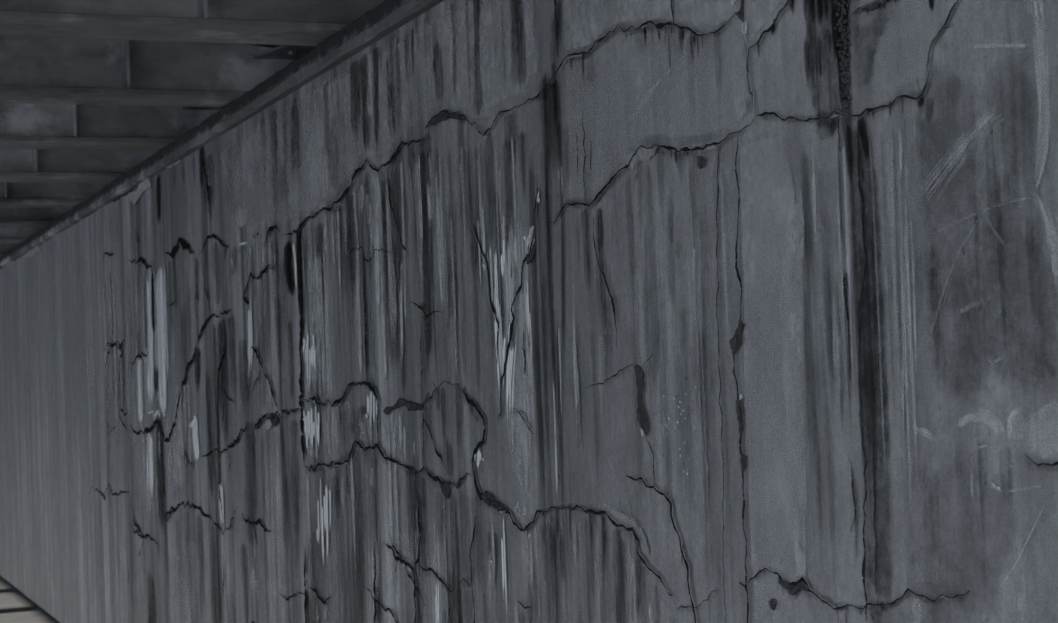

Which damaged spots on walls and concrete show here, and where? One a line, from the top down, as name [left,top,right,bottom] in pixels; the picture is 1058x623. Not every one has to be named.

crack [89,474,160,557]
crack [104,228,231,467]
water stain [103,259,253,529]
water stain [307,452,355,561]
water stain [388,414,462,623]
water stain [489,519,519,623]
water stain [221,0,888,491]
crack [164,0,970,623]
water stain [585,512,651,623]
crack [1023,453,1058,467]